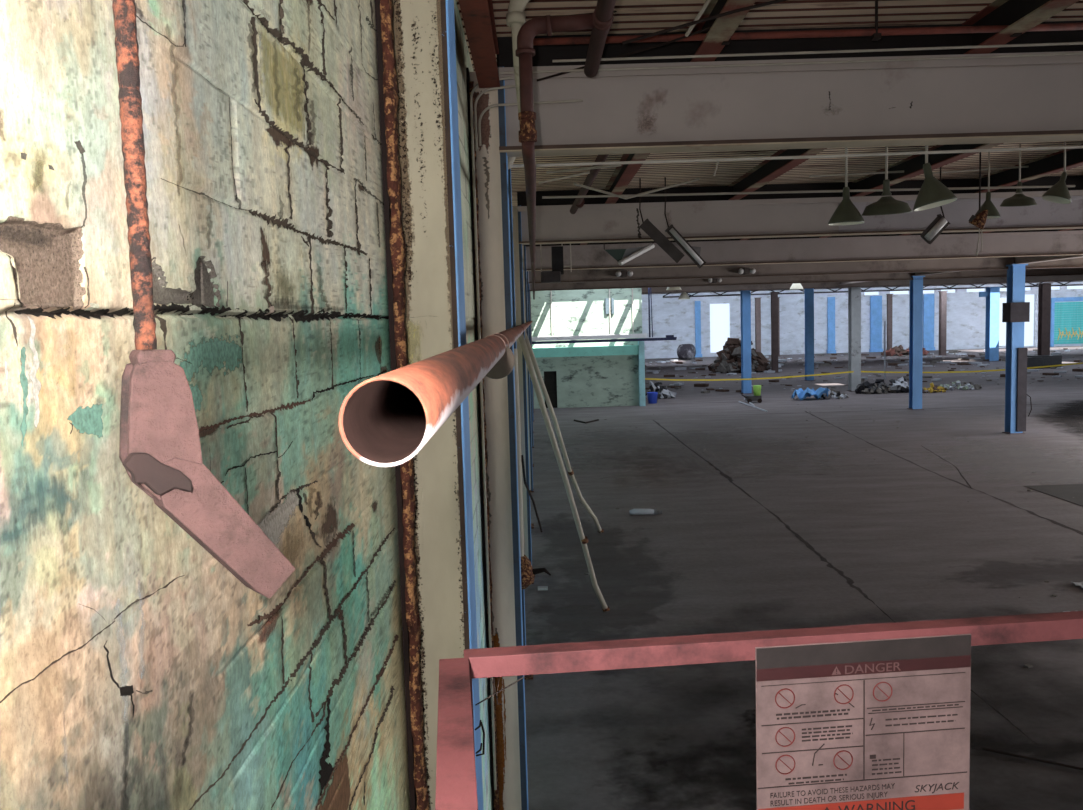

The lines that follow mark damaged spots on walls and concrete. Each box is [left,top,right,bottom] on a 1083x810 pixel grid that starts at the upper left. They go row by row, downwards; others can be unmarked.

rust [392,0,453,365]
spalling [0,216,86,310]
spalling [152,256,228,308]
peeling [68,404,103,438]
crack [0,0,399,810]
peeling [179,333,243,412]
rust [375,336,387,371]
peeling [258,491,299,546]
crack [653,420,892,620]
rust [413,457,432,804]
rust [495,677,506,810]